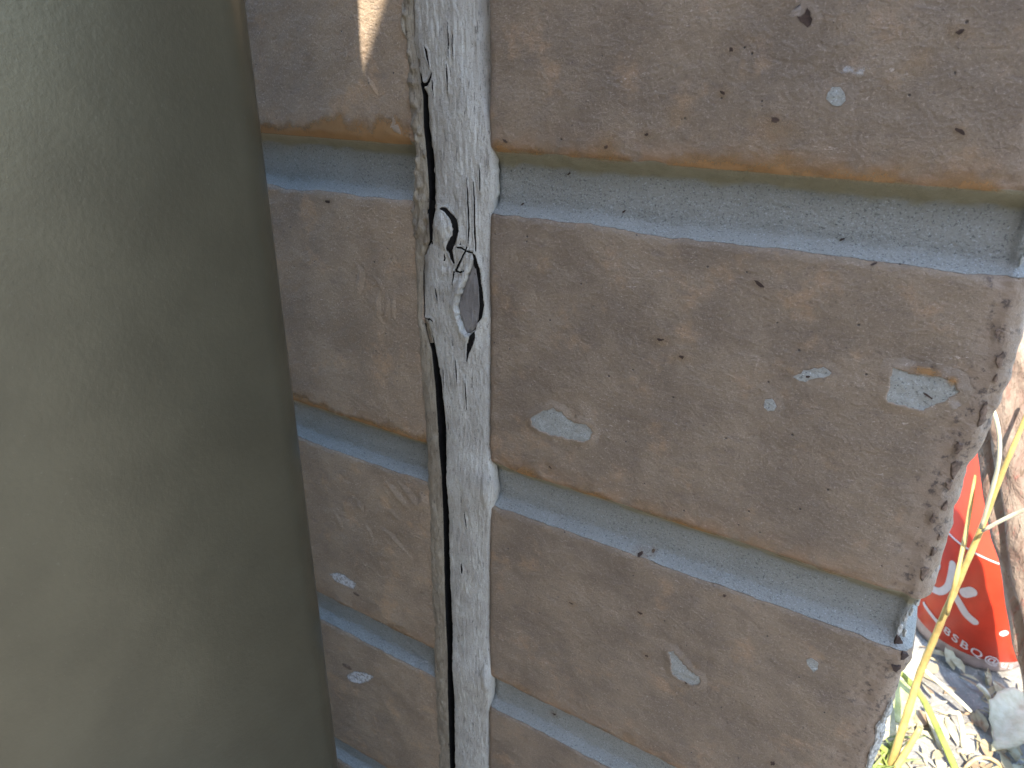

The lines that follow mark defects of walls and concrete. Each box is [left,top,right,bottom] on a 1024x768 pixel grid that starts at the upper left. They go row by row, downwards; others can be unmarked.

peeling [814,76,860,115]
corrosion [260,114,412,145]
corrosion [667,154,911,184]
crack [415,22,480,768]
peeling [786,359,843,391]
peeling [874,358,975,421]
peeling [524,399,602,449]
peeling [662,644,708,692]